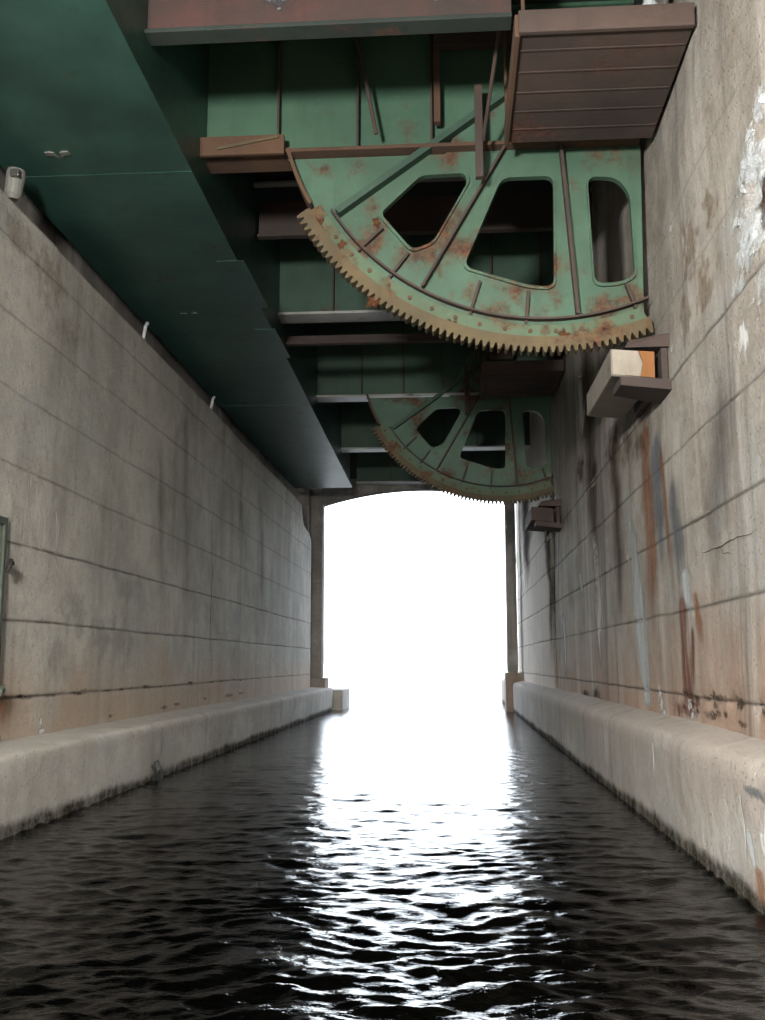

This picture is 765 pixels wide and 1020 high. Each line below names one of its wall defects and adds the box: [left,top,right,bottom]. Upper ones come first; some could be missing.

spalling [733,86,765,293]
leakage [522,500,530,564]
leakage [545,530,566,667]
leakage [578,349,602,655]
corrosion [642,427,670,594]
corrosion [678,594,701,716]
crack [703,532,753,554]
leakage [740,786,765,869]